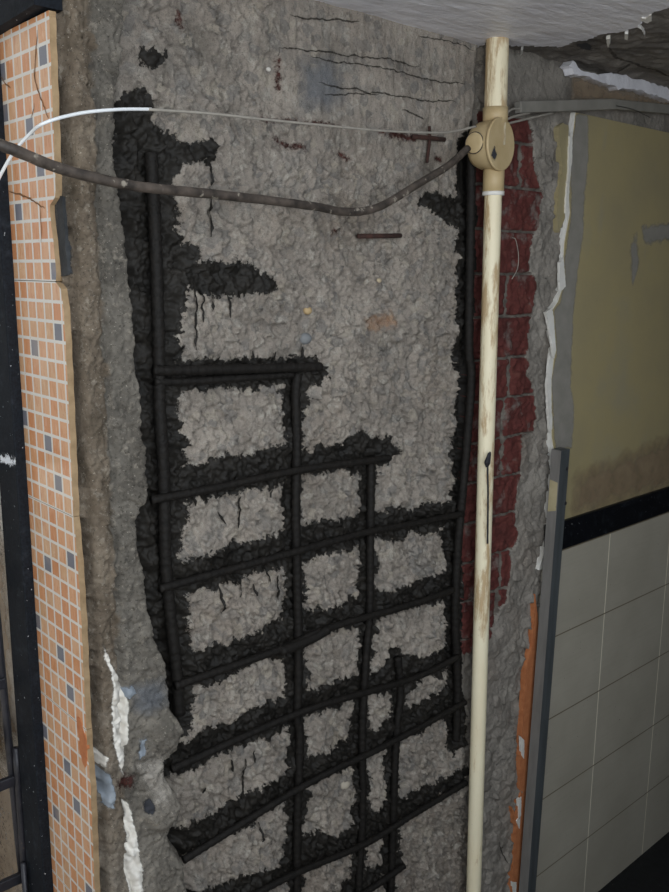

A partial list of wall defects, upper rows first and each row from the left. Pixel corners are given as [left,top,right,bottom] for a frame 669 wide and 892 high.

crack [31,40,48,117]
crack [290,14,360,23]
spalling [56,0,669,208]
crack [278,47,464,119]
crack [420,36,473,51]
spalling [61,175,291,892]
spalling [153,154,484,892]
spalling [481,110,669,892]